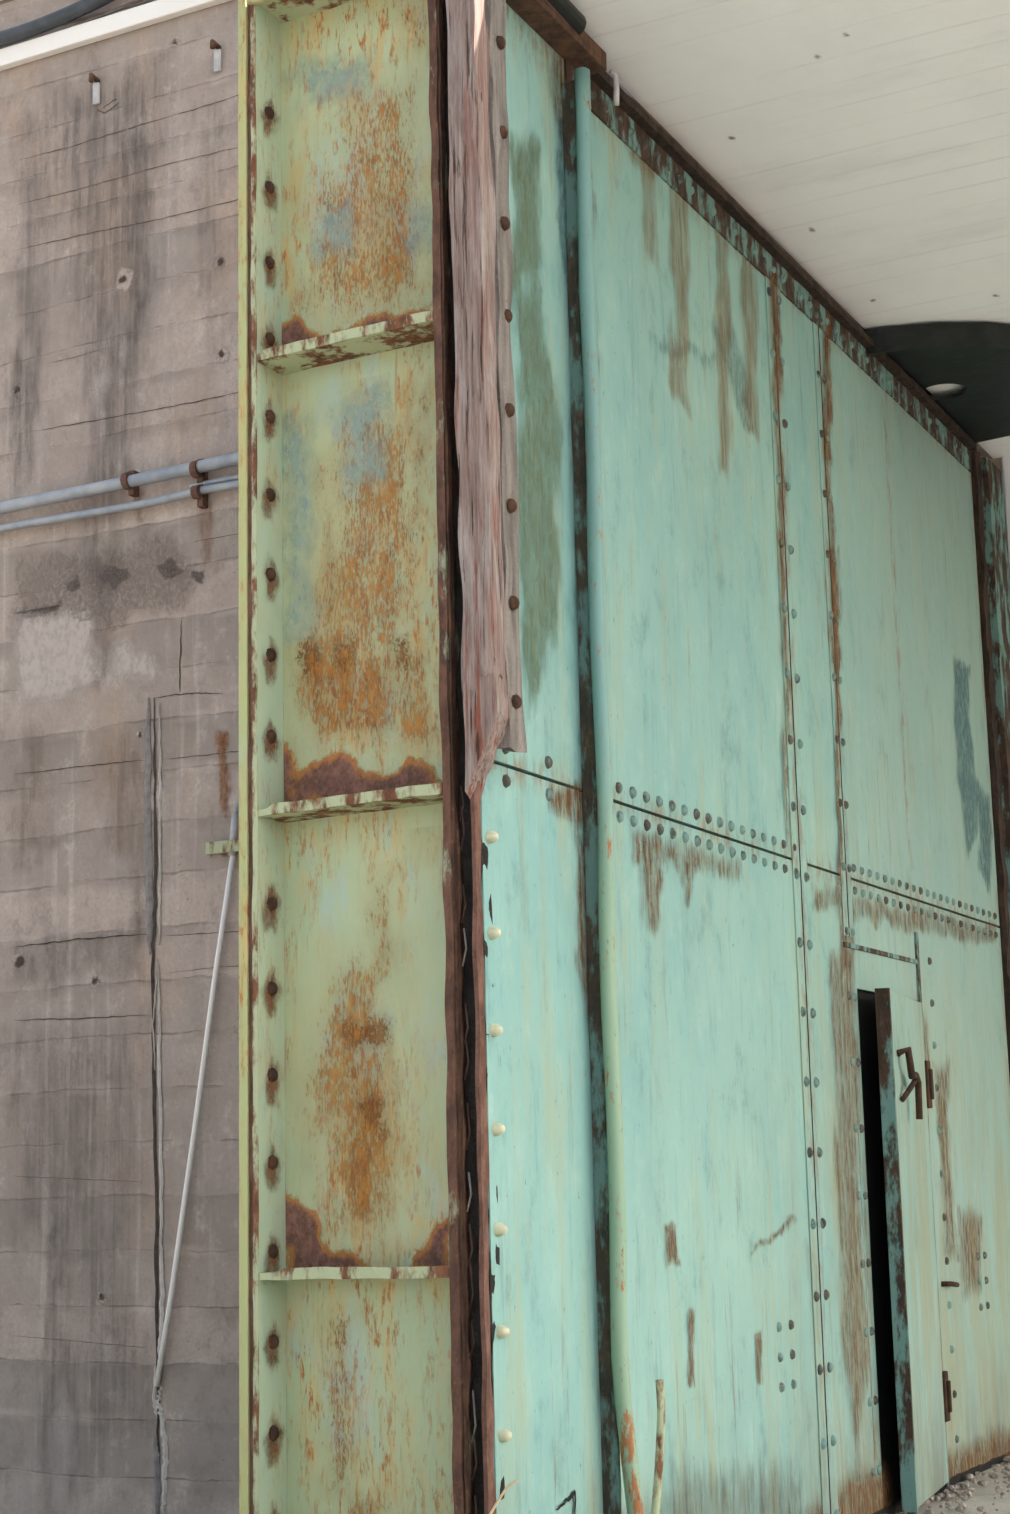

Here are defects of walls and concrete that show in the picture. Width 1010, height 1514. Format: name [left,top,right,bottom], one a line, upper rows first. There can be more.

corrosion [263,70,425,349]
corrosion [263,482,276,516]
corrosion [265,389,441,802]
corrosion [218,733,230,810]
corrosion [633,834,737,926]
corrosion [816,311,995,1435]
corrosion [264,886,414,1272]
corrosion [413,1216,449,1267]
corrosion [331,1318,353,1480]